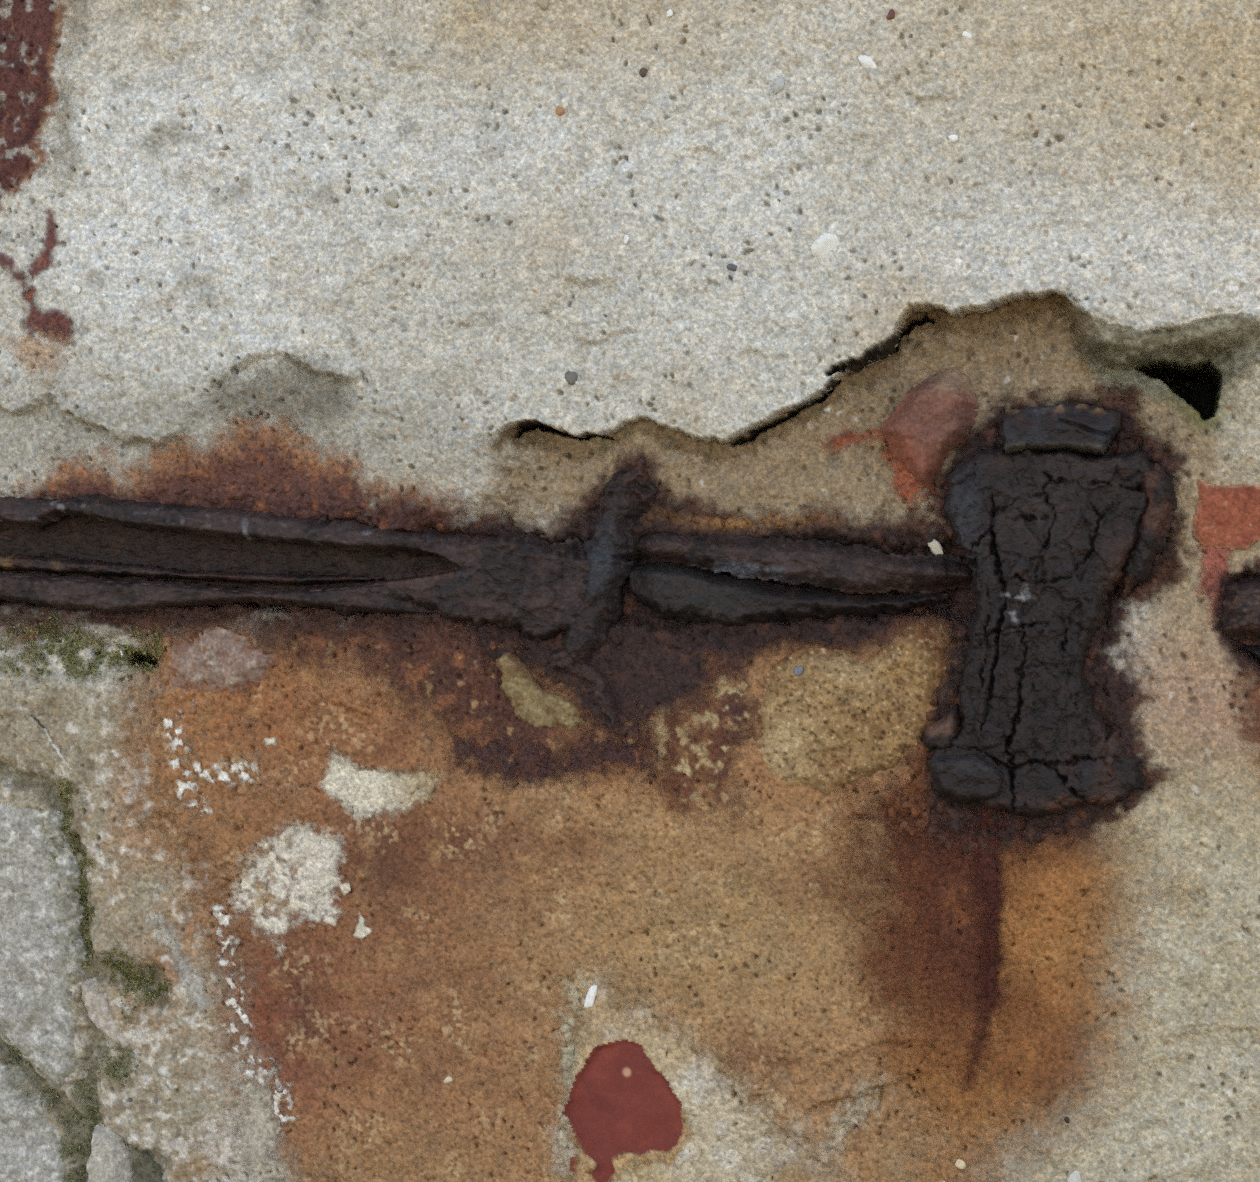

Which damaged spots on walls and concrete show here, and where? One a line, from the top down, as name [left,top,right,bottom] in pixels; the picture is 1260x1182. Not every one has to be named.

corrosion [615,389,1045,560]
spalling [494,293,1260,461]
peeling [928,539,943,556]
corrosion [1066,385,1186,483]
peeling [1117,463,1177,601]
corrosion [1208,561,1260,662]
corrosion [1234,676,1260,742]
corrosion [0,510,1191,1182]
peeling [553,965,885,1182]